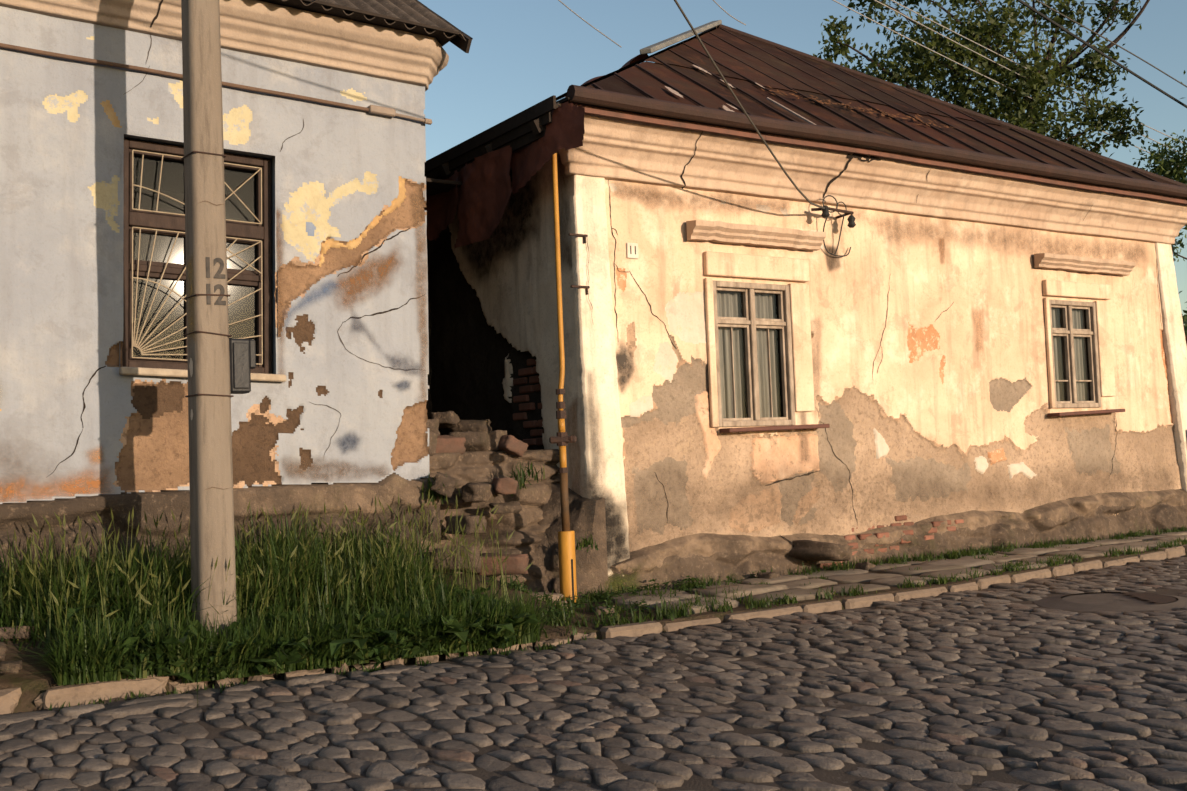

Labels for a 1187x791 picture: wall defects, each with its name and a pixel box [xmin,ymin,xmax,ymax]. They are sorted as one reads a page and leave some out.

crack [123,0,163,95]
peeling [42,90,122,128]
flaking render [274,171,427,354]
crack [584,179,676,348]
crack [46,366,106,478]
flaking render [113,379,190,492]
flaking render [232,396,304,488]
flaking render [299,448,313,469]
flaking render [316,385,329,396]
crack [337,293,426,371]
flaking render [391,226,544,471]
flaking render [621,291,1182,569]